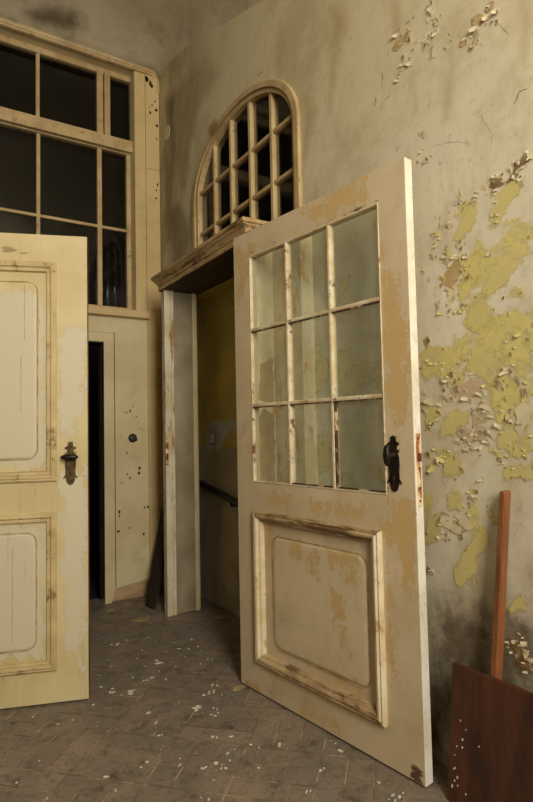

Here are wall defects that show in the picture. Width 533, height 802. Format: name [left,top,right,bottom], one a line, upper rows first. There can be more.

damp [34,10,73,26]
peeling [391,0,442,82]
peeling [445,1,499,51]
peeling [419,150,533,482]
peeling [423,477,498,587]
flaking render [504,632,533,675]